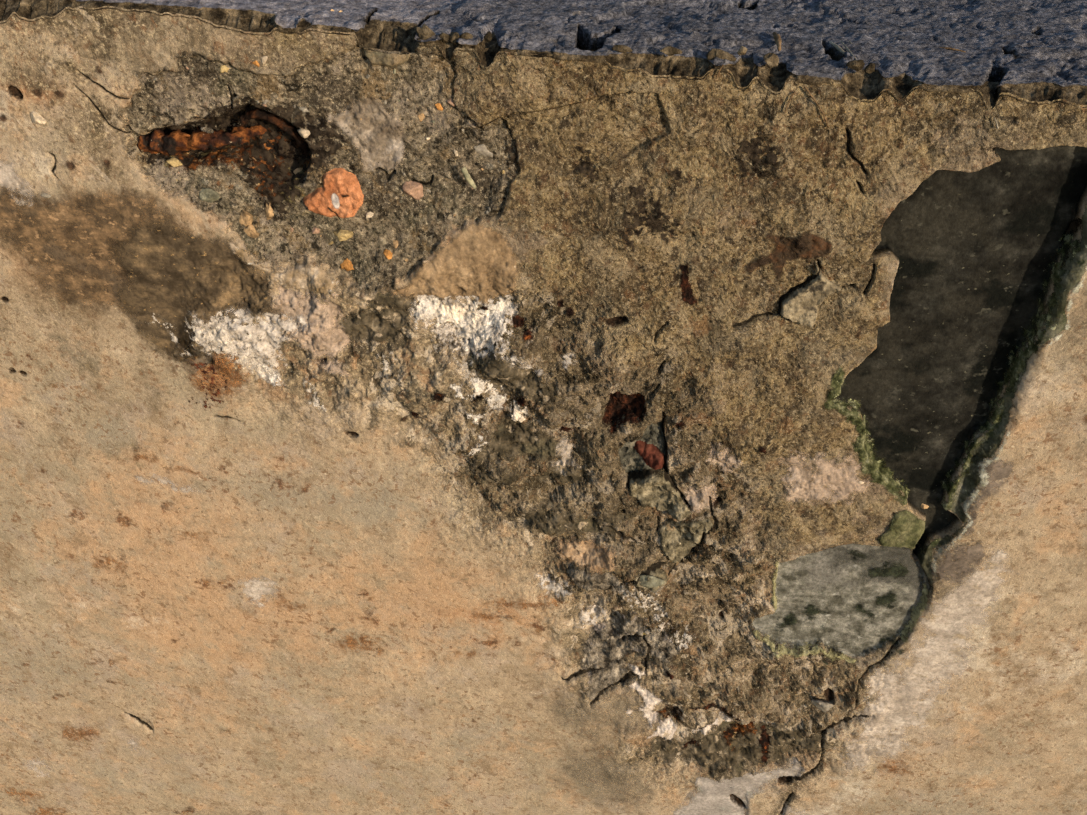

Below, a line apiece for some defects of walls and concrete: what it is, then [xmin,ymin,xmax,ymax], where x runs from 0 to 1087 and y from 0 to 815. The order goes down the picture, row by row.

efflorescence [0,161,33,206]
corrosion [128,97,349,221]
spalling [116,44,520,376]
leakage [116,219,308,395]
leakage [337,292,599,488]
corrosion [602,391,647,434]
spalling [752,146,1087,658]
leakage [518,499,645,544]
flaking render [555,536,617,573]
flaking render [685,485,722,513]
spalling [580,610,682,741]
crack [780,627,910,814]